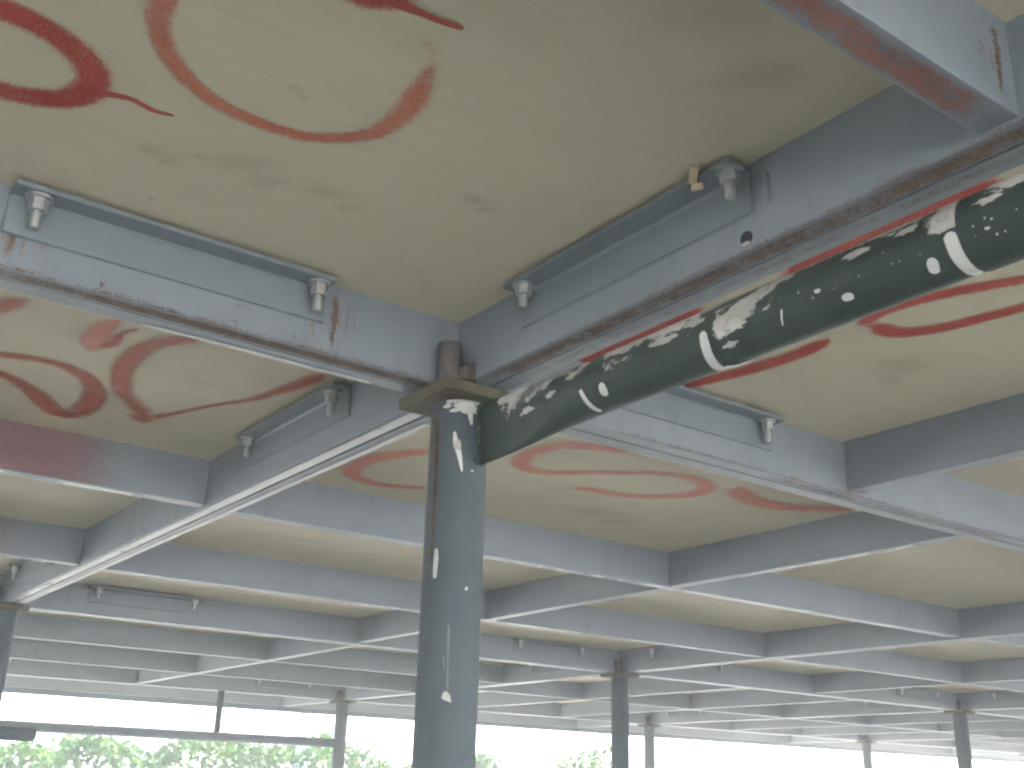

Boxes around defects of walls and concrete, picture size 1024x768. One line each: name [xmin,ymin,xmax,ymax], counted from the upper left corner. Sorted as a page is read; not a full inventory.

rust [978,19,1004,91]
rust [0,230,435,387]
rust [476,118,1024,381]
peeling [497,171,1024,419]
peeling [443,400,480,425]